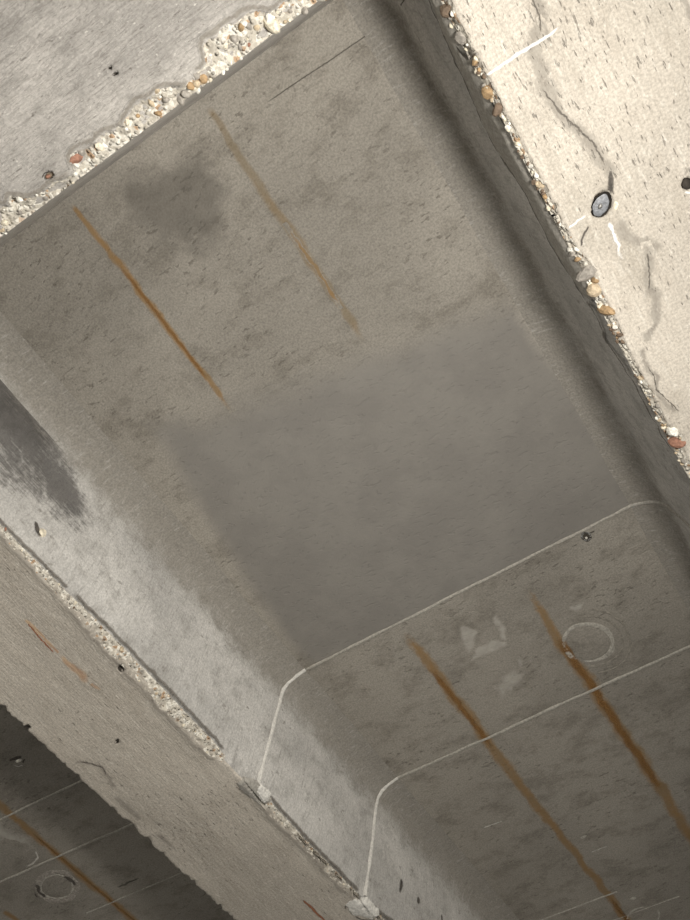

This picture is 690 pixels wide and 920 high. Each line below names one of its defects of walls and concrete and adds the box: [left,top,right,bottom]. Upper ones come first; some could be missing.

corrosion [68,199,236,414]
spalling [0,0,325,237]
corrosion [203,103,371,349]
crack [273,36,365,99]
crack [429,0,684,446]
spalling [440,0,690,480]
leakage [0,379,82,518]
spalling [0,518,225,765]
spalling [251,796,360,901]
peeling [457,612,511,662]
corrosion [395,627,633,920]
corrosion [520,583,690,847]